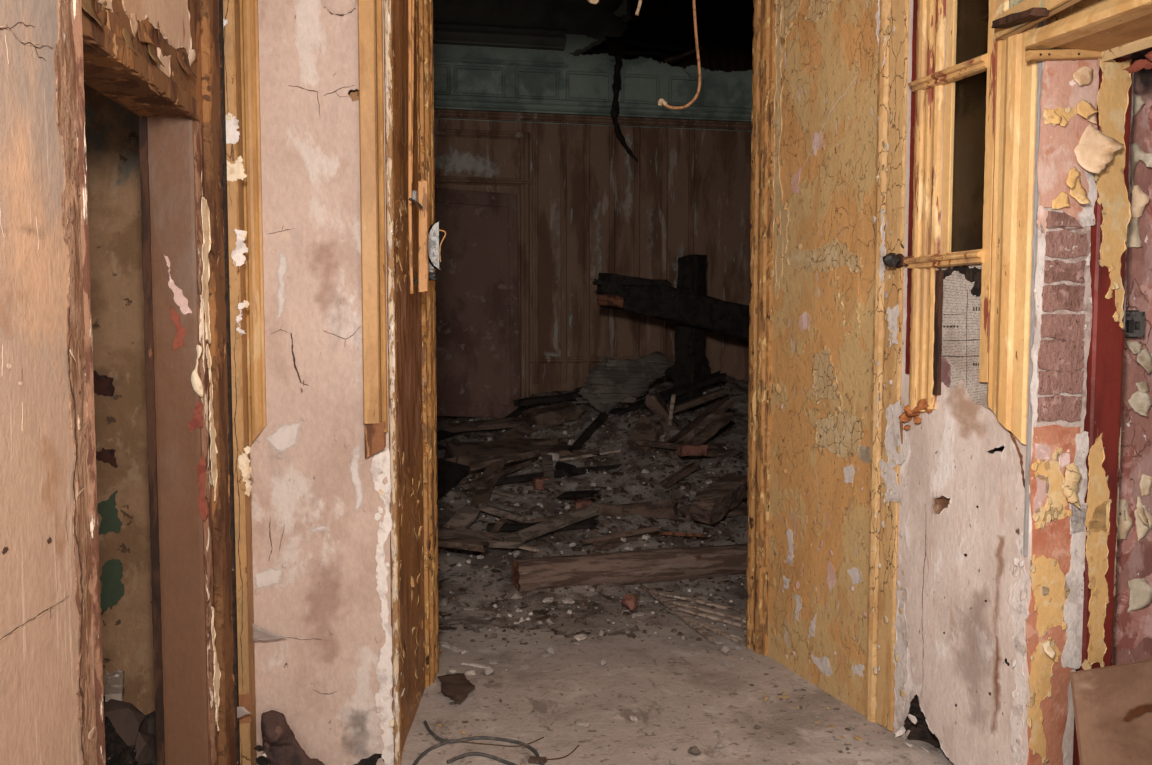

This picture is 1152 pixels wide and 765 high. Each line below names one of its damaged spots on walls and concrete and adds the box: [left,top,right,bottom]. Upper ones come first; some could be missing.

crack [0,22,51,61]
flaking render [0,0,197,765]